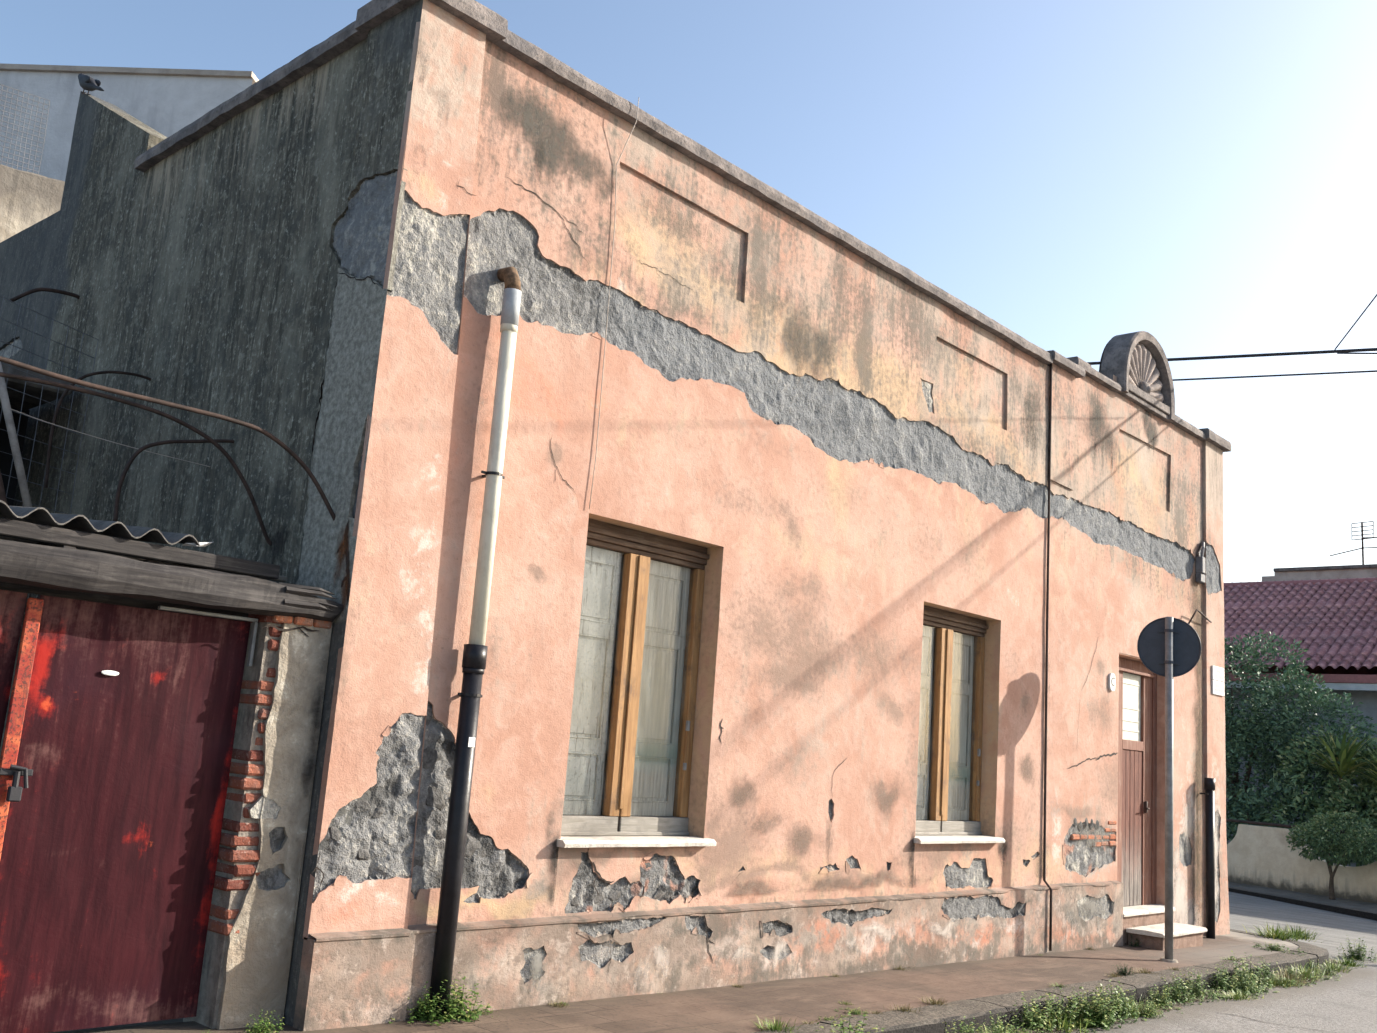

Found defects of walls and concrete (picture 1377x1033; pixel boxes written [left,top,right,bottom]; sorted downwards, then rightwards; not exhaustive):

water stain [505,96,614,190]
crack [505,176,587,261]
spalling [332,171,1221,595]
crack [1068,634,1117,769]
spalling [250,797,289,891]
spalling [312,702,455,908]
spalling [461,815,533,903]
spalling [520,946,546,983]
spalling [565,848,711,968]
spalling [759,920,791,960]
spalling [941,858,1025,922]
spalling [1062,817,1117,877]